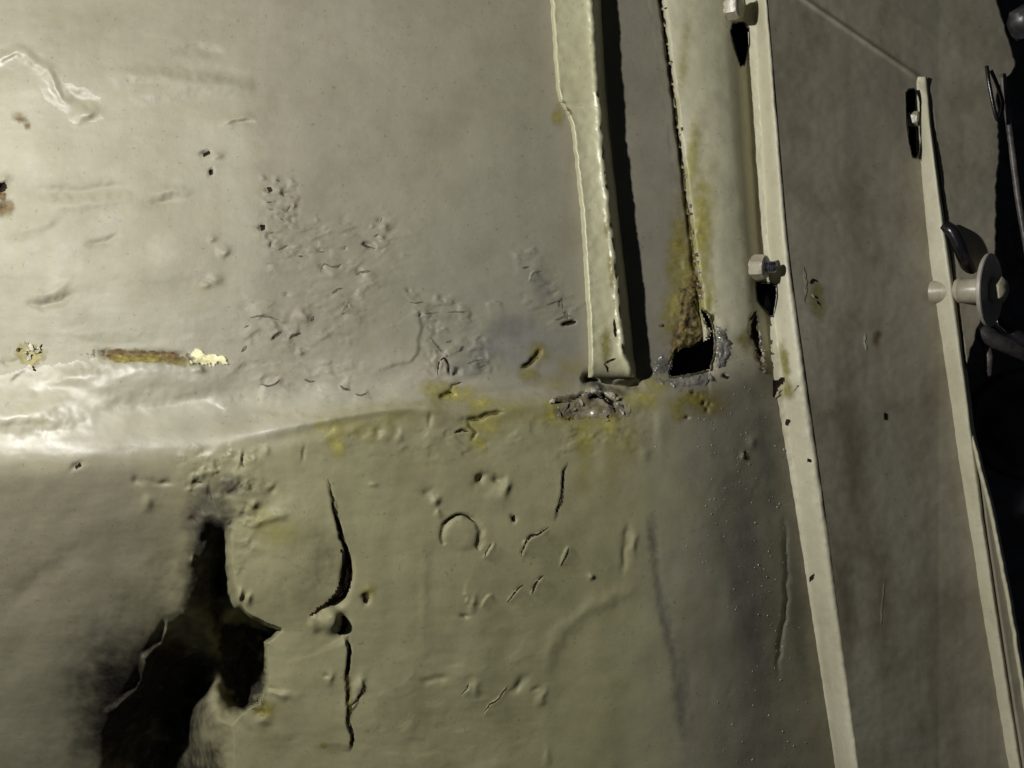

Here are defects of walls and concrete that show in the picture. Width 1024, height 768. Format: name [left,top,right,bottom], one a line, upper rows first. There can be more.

rust [664,188,711,348]
rust [92,349,191,366]
peeling [190,349,228,366]
peeling [750,311,798,398]
peeling [548,385,630,421]
crack [520,465,567,557]
crack [309,479,363,745]
crack [507,547,569,602]